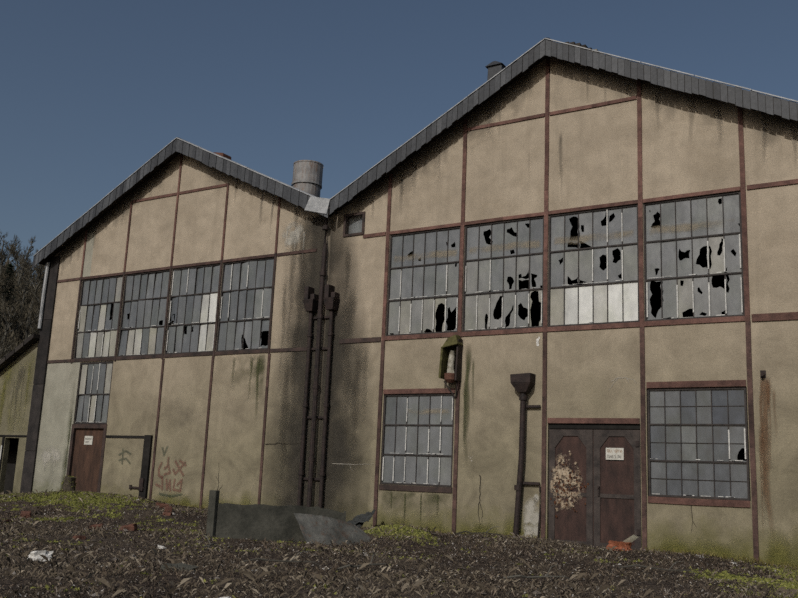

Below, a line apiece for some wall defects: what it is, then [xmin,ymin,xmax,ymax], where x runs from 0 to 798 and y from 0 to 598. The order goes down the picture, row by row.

leakage [251,359,264,388]
leakage [278,216,356,512]
corrosion [760,381,769,449]
peeling [524,495,539,536]
peeling [550,451,589,518]